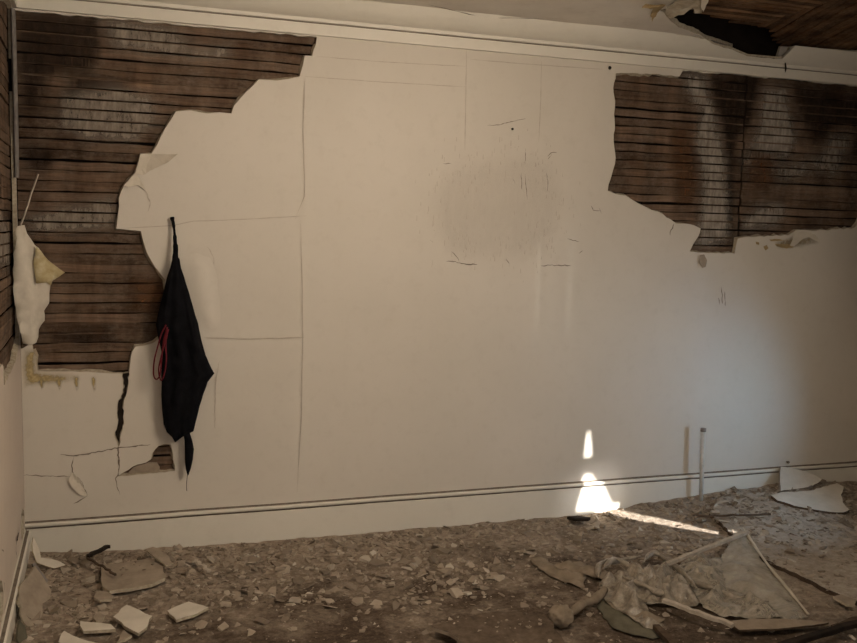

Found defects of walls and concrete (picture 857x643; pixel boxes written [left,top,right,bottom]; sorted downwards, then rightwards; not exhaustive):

flaking render [642,0,857,59]
flaking render [0,0,316,385]
flaking render [608,71,857,268]
crack [29,371,148,503]
flaking render [119,444,175,476]